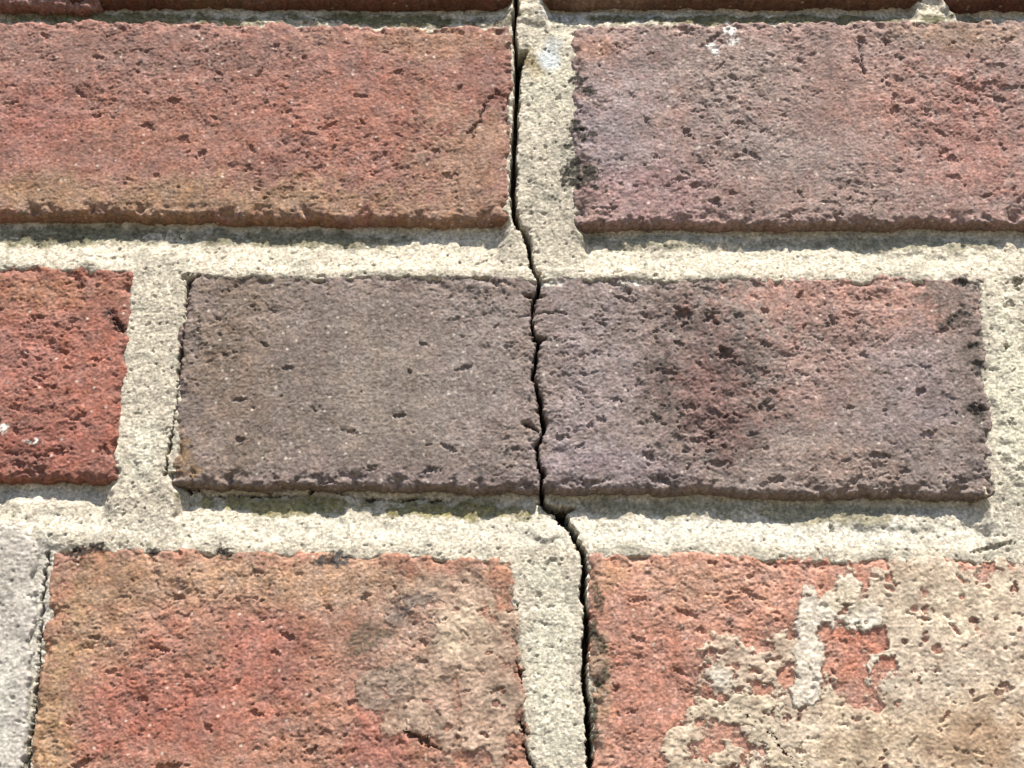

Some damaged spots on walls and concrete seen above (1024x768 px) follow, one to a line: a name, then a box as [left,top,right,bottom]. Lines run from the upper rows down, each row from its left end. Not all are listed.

crack [468,0,531,265]
crack [525,289,591,768]
crack [518,722,534,768]
peeling [660,555,1024,768]